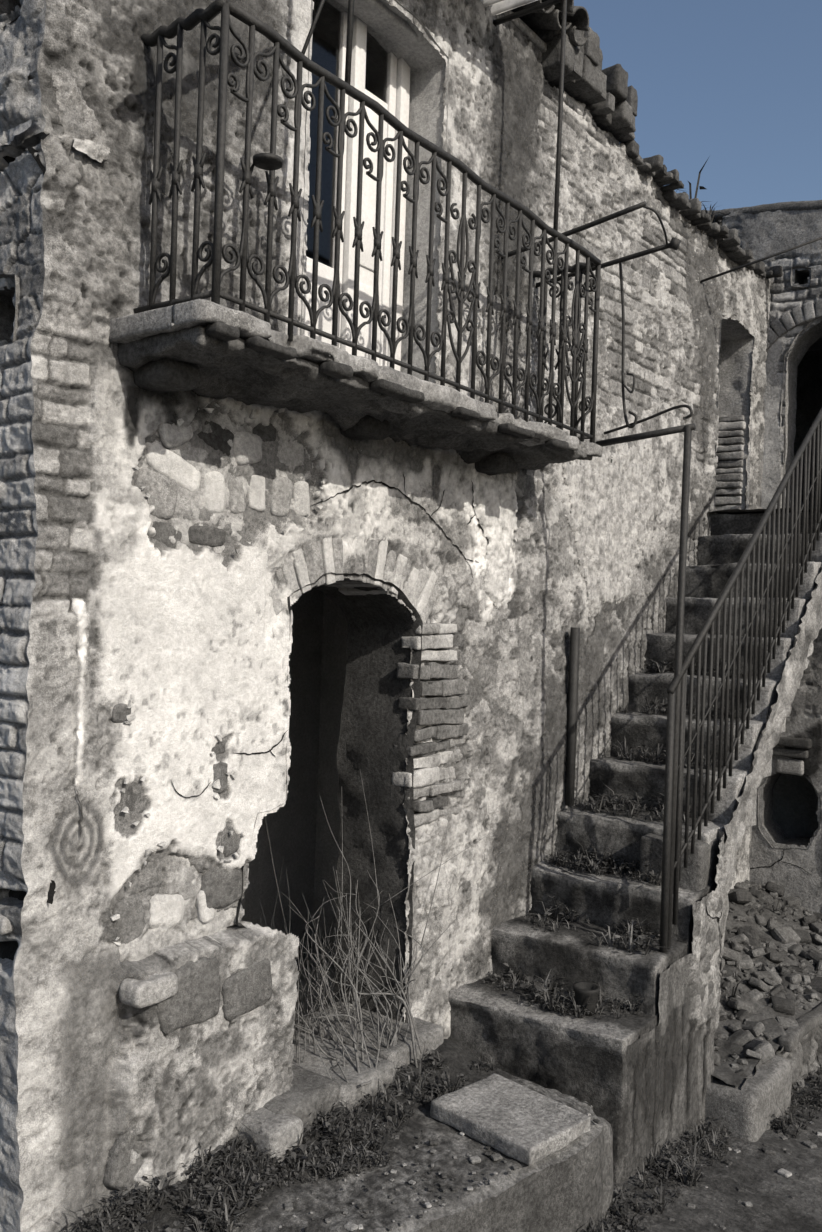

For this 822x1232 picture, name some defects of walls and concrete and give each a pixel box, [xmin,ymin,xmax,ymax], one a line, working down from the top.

flaking render [133,404,327,554]
crack [312,474,489,581]
flaking render [121,775,151,826]
crack [750,846,811,875]
flaking render [110,827,272,1034]